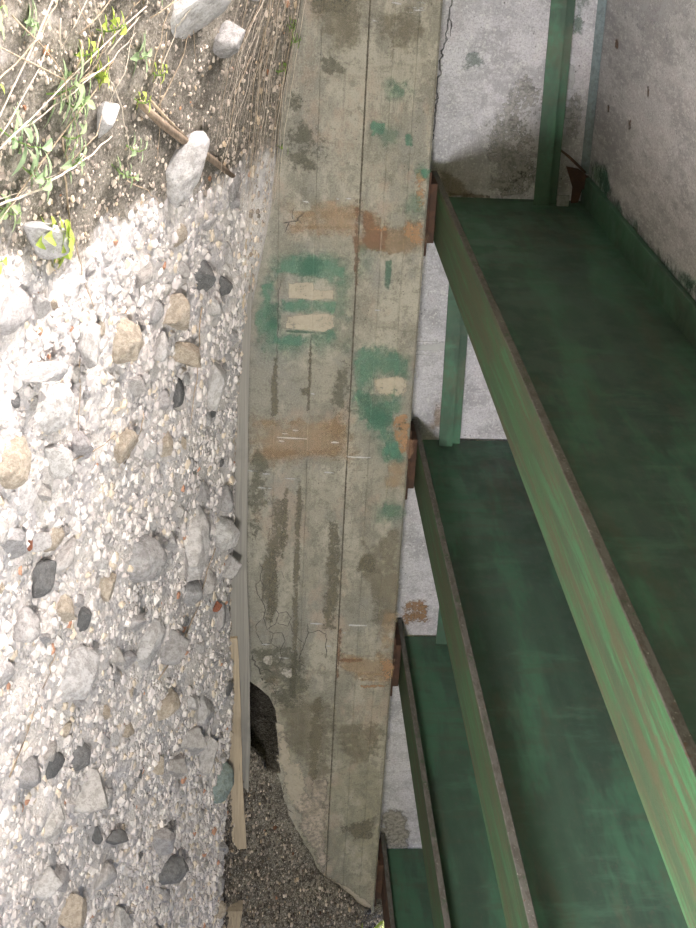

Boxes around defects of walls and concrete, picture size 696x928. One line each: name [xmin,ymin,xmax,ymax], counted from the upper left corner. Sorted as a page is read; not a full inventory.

crack [432,0,453,141]
corrosion [337,170,426,285]
water stain [248,453,303,697]
crack [251,562,327,686]
water stain [323,523,367,633]